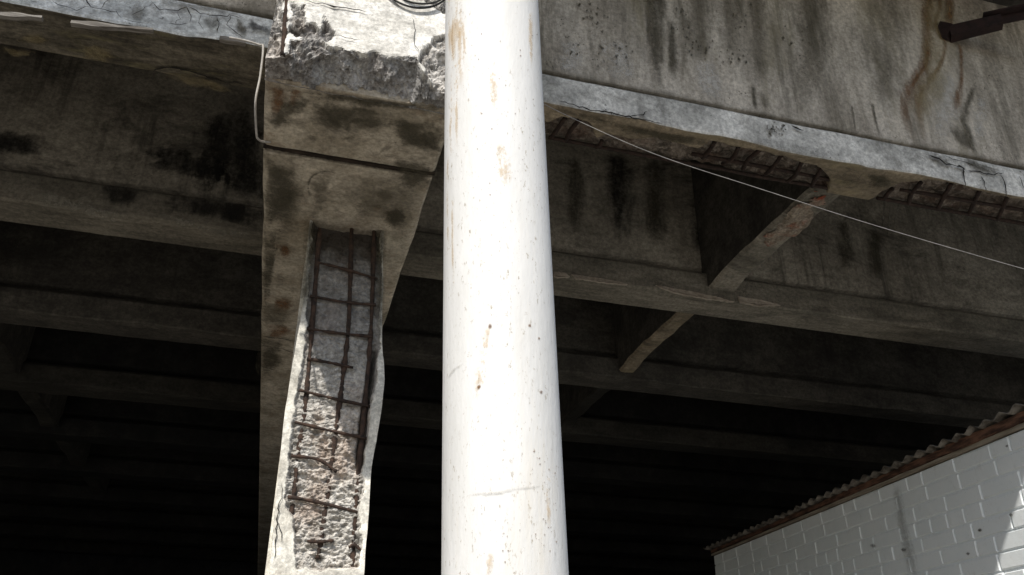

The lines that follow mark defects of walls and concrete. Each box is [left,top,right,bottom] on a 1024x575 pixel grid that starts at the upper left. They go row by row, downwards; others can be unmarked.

crack [31,0,242,37]
spalling [250,0,445,115]
damp [647,0,748,89]
rust [901,0,953,114]
damp [0,132,38,154]
damp [154,112,296,224]
damp [272,101,305,126]
damp [317,95,440,151]
spalling [545,116,830,247]
spalling [876,179,1024,226]
crack [930,155,1024,196]
spalling [284,222,382,572]